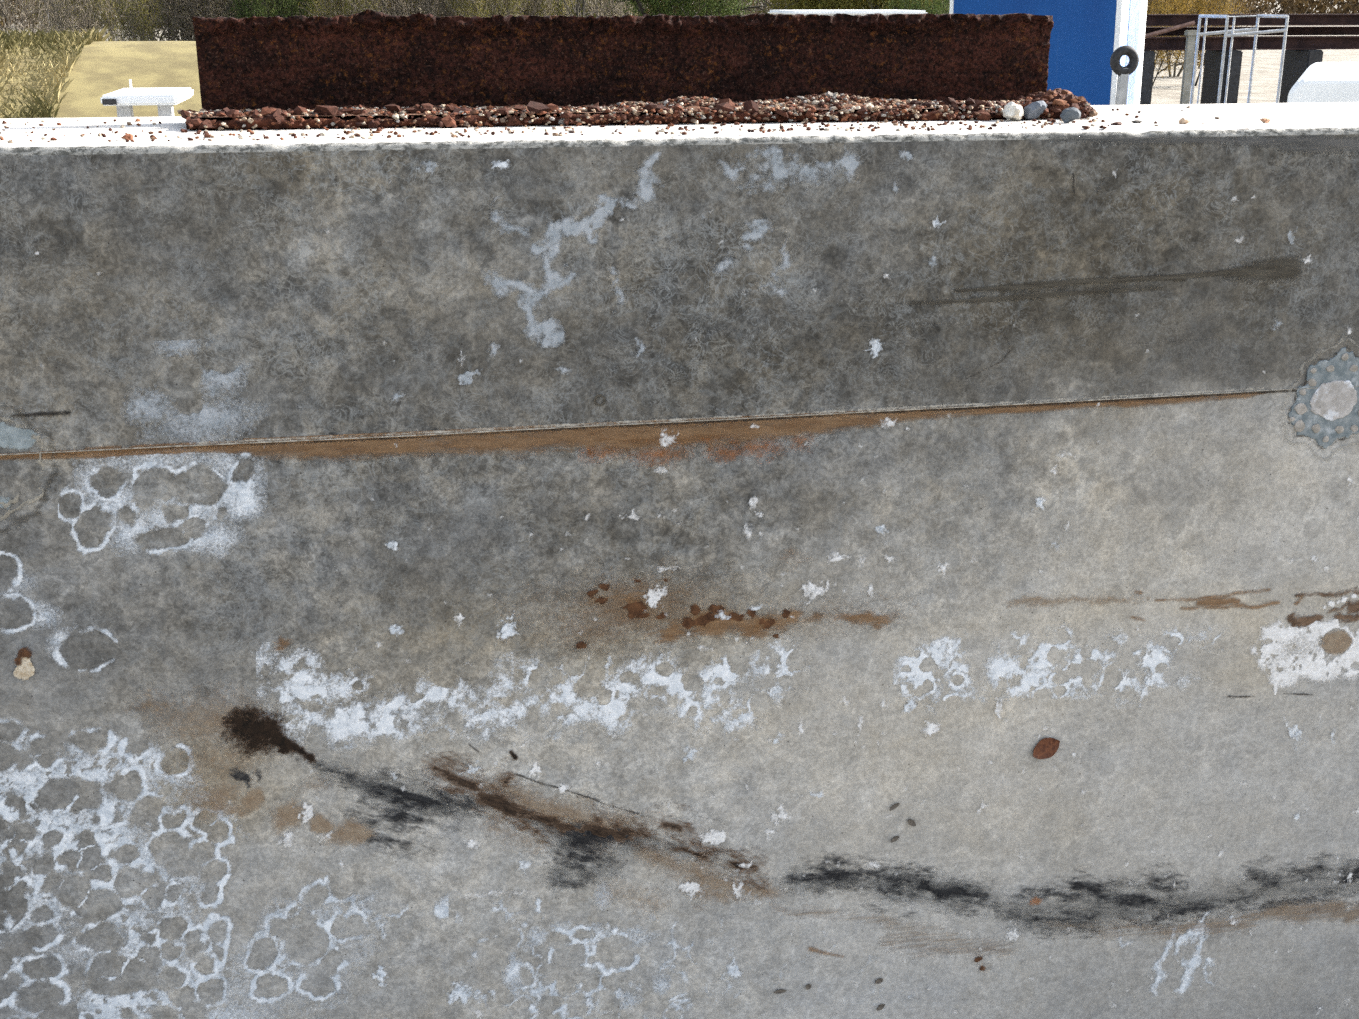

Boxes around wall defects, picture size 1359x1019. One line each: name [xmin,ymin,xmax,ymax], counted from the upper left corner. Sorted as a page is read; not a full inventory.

leakage [487,153,659,348]
leakage [22,368,262,556]
corrosion [0,392,1260,459]
leakage [0,551,109,672]
leakage [256,641,798,749]
corrosion [660,611,819,641]
corrosion [842,613,889,629]
leakage [893,626,1220,706]
corrosion [1181,589,1359,627]
leakage [0,719,408,1019]
leakage [474,899,693,1019]
leakage [1151,911,1213,996]